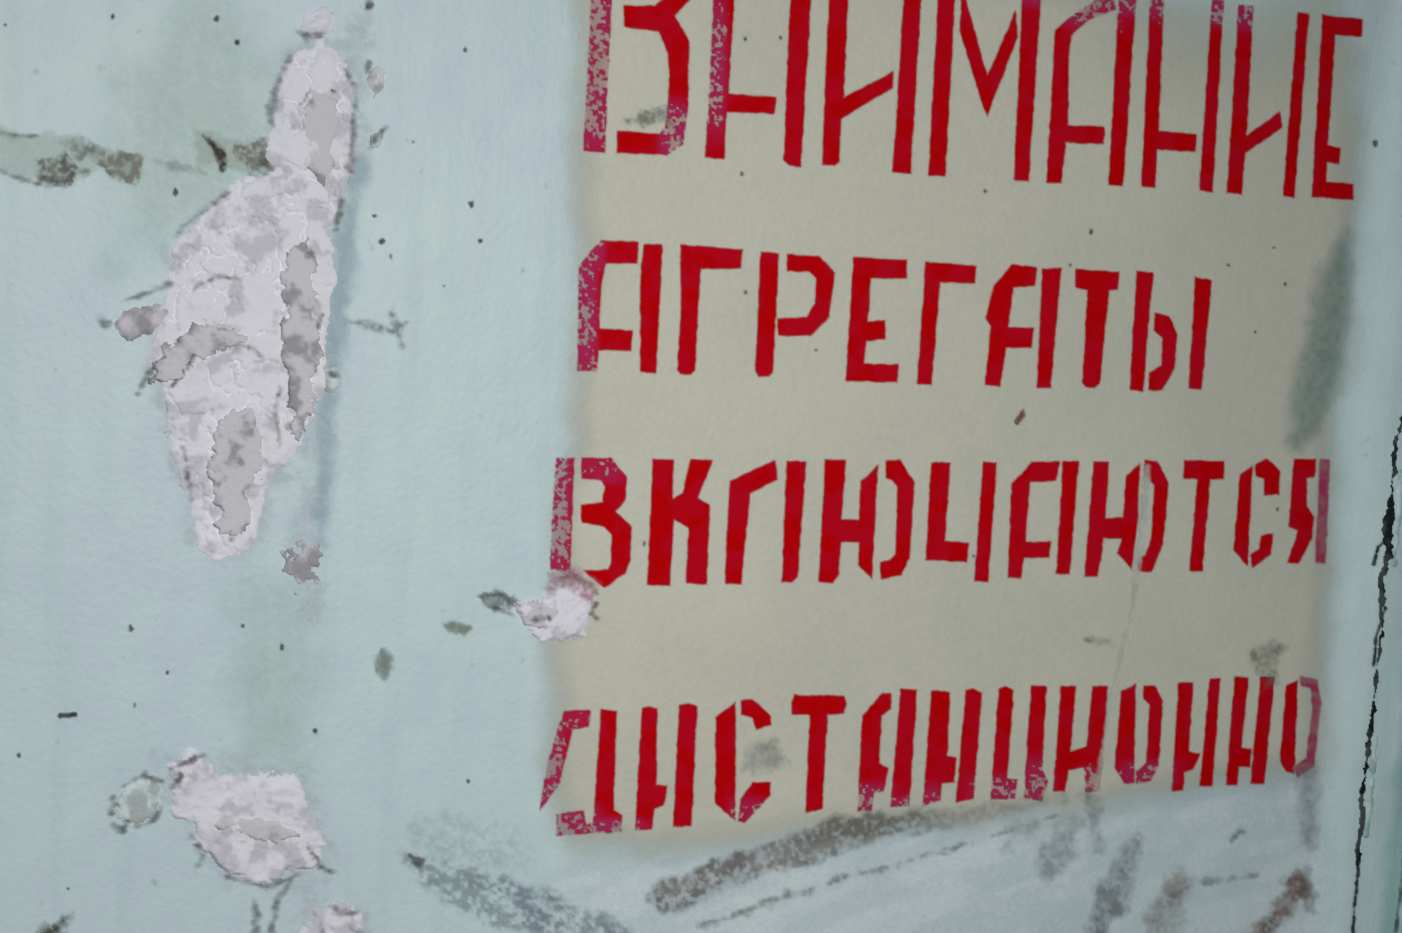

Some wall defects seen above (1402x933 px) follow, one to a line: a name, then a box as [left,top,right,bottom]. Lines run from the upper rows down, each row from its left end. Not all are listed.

flaking render [102,6,385,561]
flaking render [278,539,324,595]
flaking render [481,570,599,644]
crack [1351,416,1402,933]
flaking render [111,747,331,903]
flaking render [299,899,367,933]